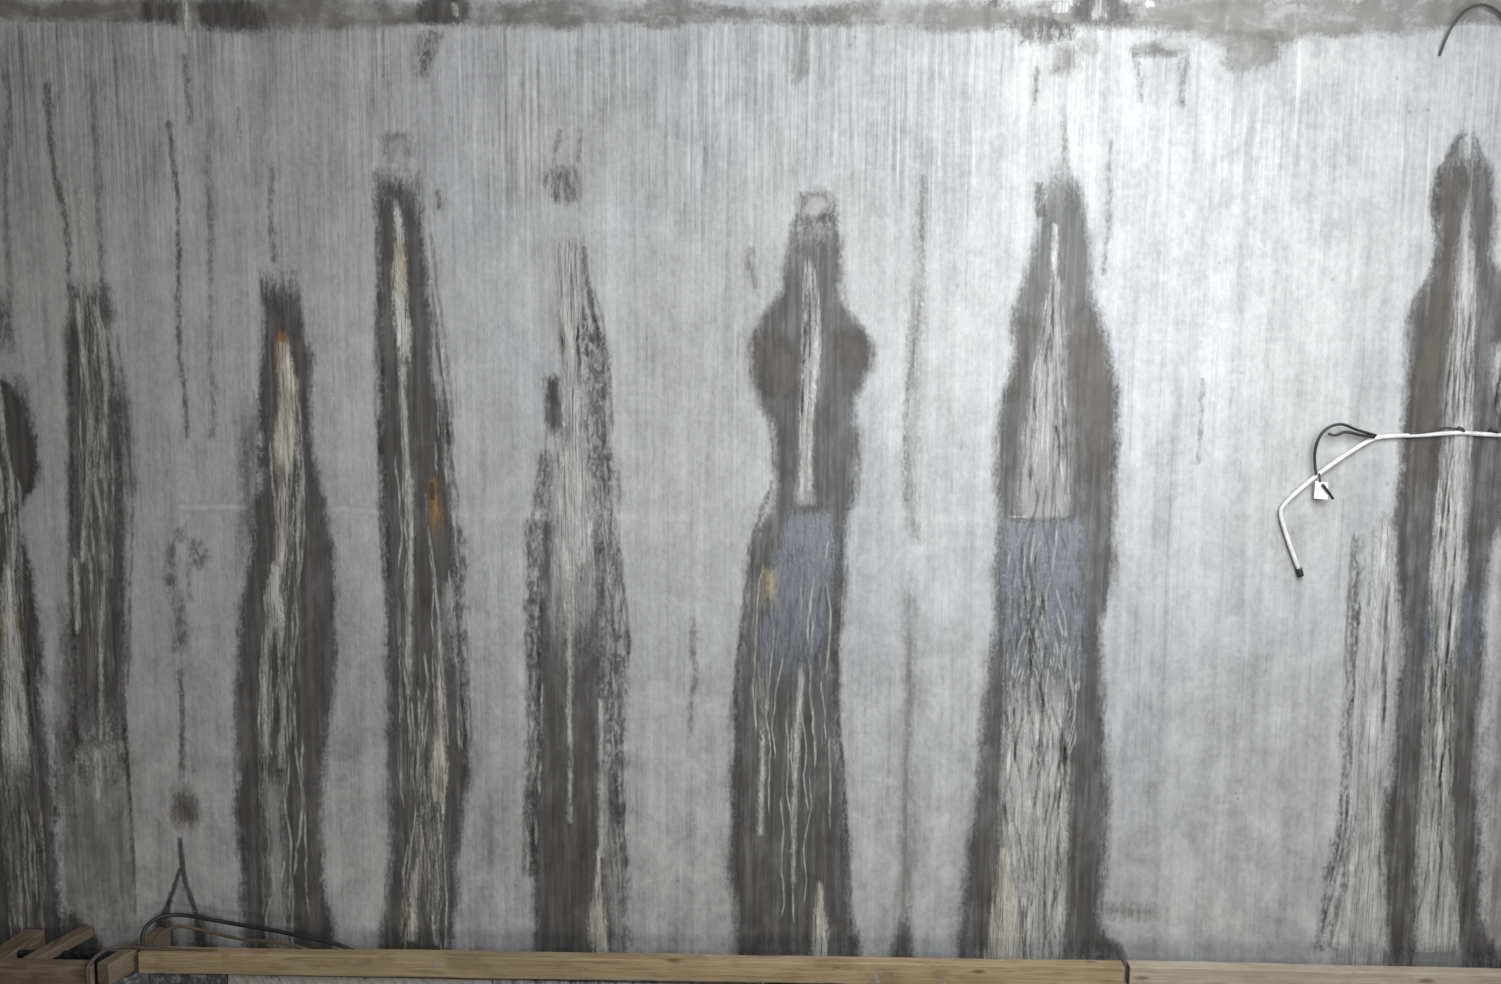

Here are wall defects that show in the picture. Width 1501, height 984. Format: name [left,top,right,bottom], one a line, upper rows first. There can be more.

water stain [0,85,135,951]
water stain [167,122,188,437]
water stain [234,280,338,949]
water stain [0,0,599,74]
water stain [377,139,469,950]
water stain [552,171,577,200]
water stain [524,239,628,953]
water stain [620,0,885,28]
water stain [729,194,874,957]
water stain [957,177,1125,966]
water stain [907,0,1501,70]
water stain [1323,137,1501,968]